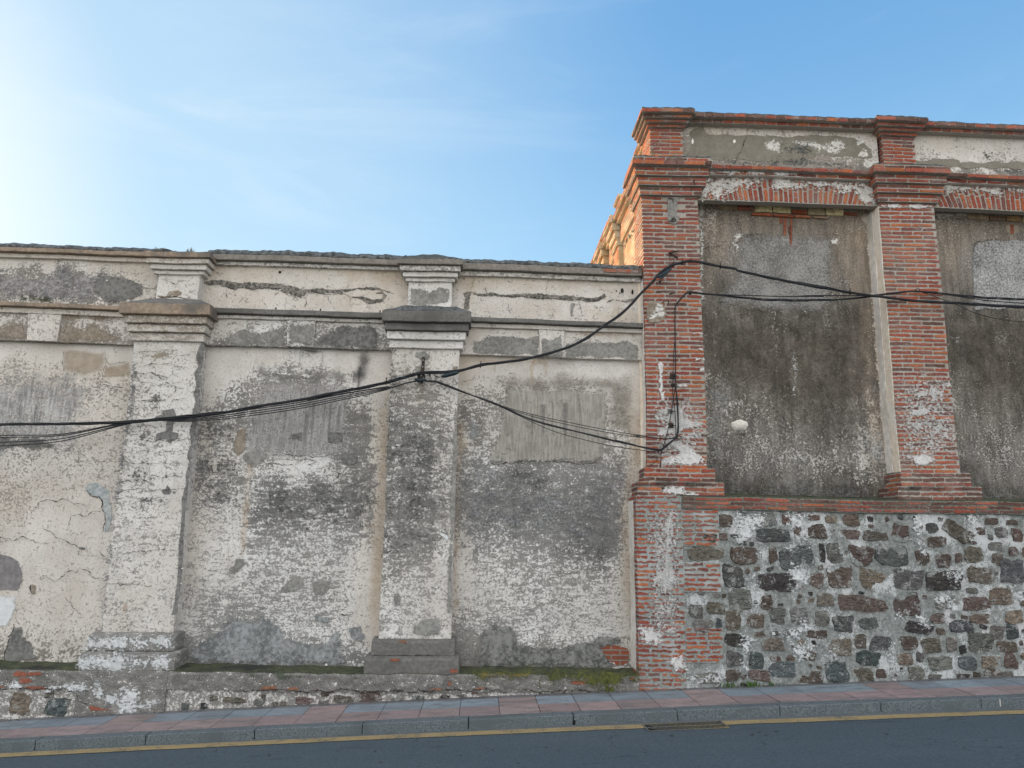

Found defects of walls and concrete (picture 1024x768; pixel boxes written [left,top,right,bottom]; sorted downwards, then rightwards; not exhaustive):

flaking render [686,127,872,162]
flaking render [0,260,143,304]
flaking render [0,554,36,595]
crack [0,349,194,614]
peeling [85,343,204,615]
leakage [193,348,731,688]